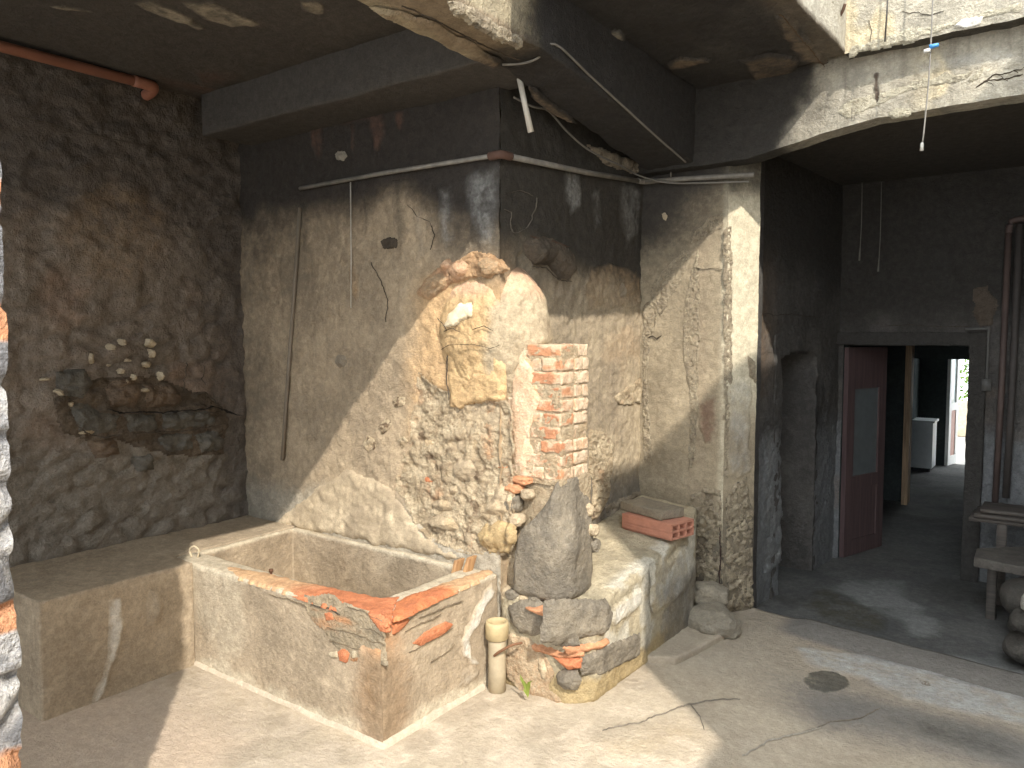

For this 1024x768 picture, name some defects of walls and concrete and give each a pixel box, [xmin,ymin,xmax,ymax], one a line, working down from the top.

peeling [369,6,503,69]
spalling [447,0,523,50]
crack [976,67,1024,88]
peeling [587,144,639,174]
crack [504,190,537,233]
crack [371,262,388,322]
spalling [39,339,229,473]
spalling [392,355,517,556]
peeling [227,567,493,667]
crack [602,698,740,731]
crack [742,708,880,756]
damp [791,645,1024,727]